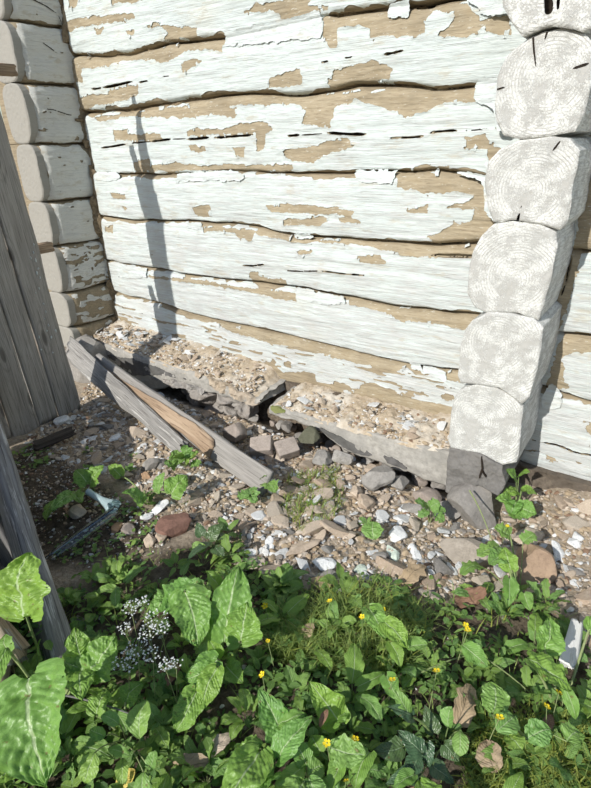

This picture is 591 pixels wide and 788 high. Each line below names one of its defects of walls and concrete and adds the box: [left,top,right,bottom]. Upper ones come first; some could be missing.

peeling [72,0,513,83]
crack [532,0,560,66]
crack [92,76,169,90]
crack [102,134,253,148]
peeling [133,137,354,183]
peeling [78,59,501,153]
crack [290,130,365,138]
crack [391,128,487,139]
peeling [187,134,501,264]
peeling [118,265,481,330]
peeling [541,179,591,409]
crack [479,456,487,478]